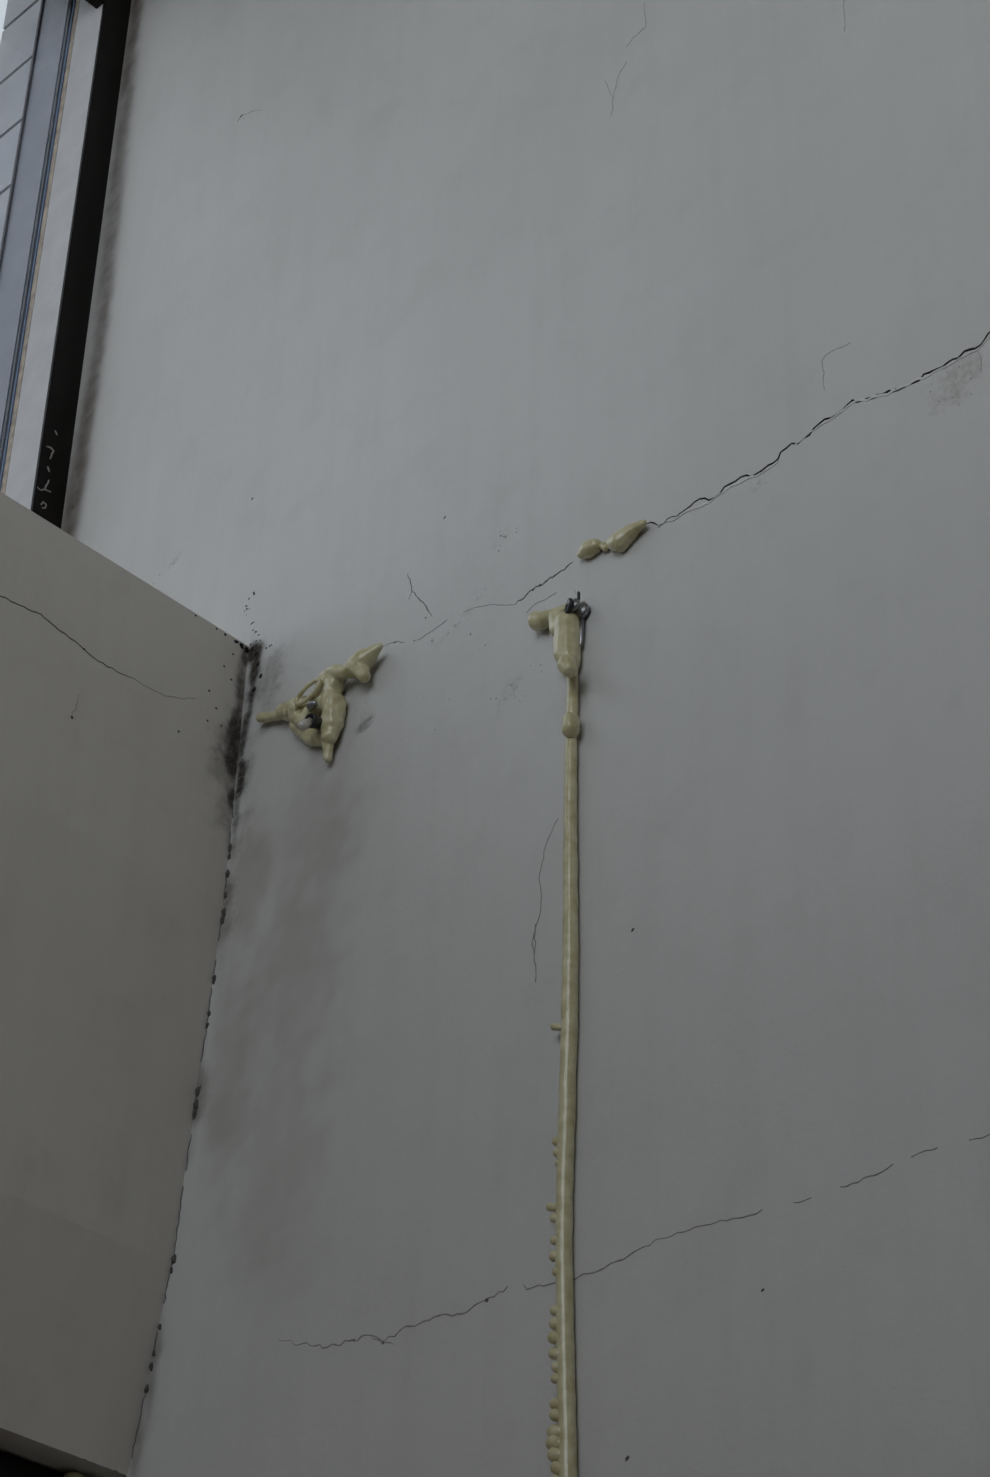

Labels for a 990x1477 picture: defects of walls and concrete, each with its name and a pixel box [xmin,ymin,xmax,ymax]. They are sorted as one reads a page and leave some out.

crack [647,331,990,528]
crack [385,562,577,646]
crack [282,1134,990,1349]